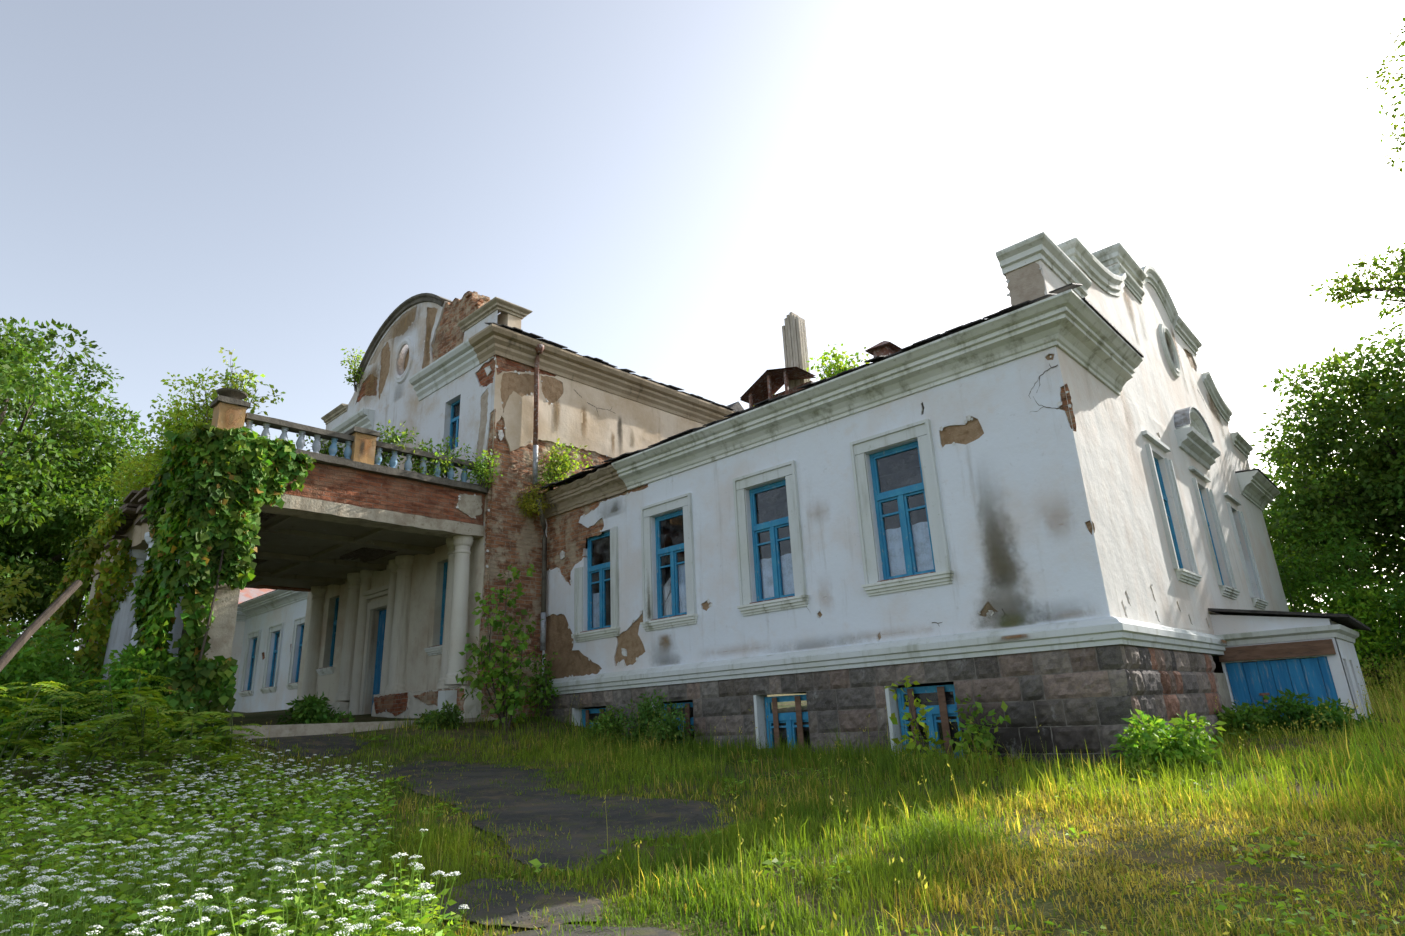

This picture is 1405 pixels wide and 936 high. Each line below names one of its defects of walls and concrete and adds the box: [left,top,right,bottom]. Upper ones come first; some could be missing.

spalling [355,291,490,404]
crack [1029,364,1061,412]
flaking render [940,414,984,447]
flaking render [373,355,648,719]
damp [1001,618,1022,627]